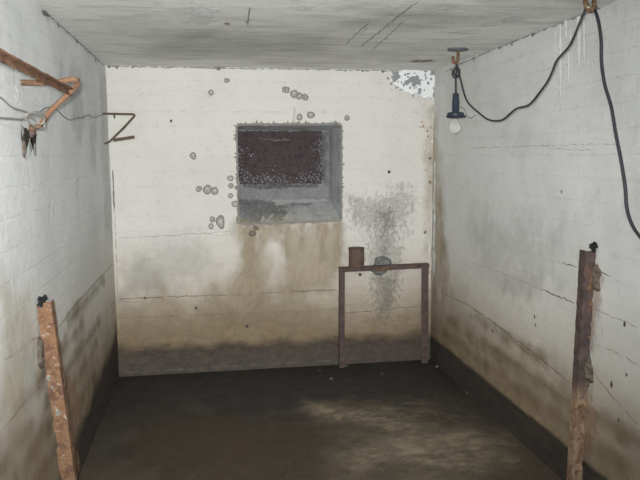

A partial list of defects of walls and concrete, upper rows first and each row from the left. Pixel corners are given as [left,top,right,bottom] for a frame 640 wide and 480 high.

crack [51,17,401,73]
crack [346,2,418,50]
peeling [387,70,435,104]
efflorescence [554,16,585,108]
crack [473,263,574,303]
leakage [71,226,569,480]
crack [441,292,569,402]
leakage [582,437,640,480]